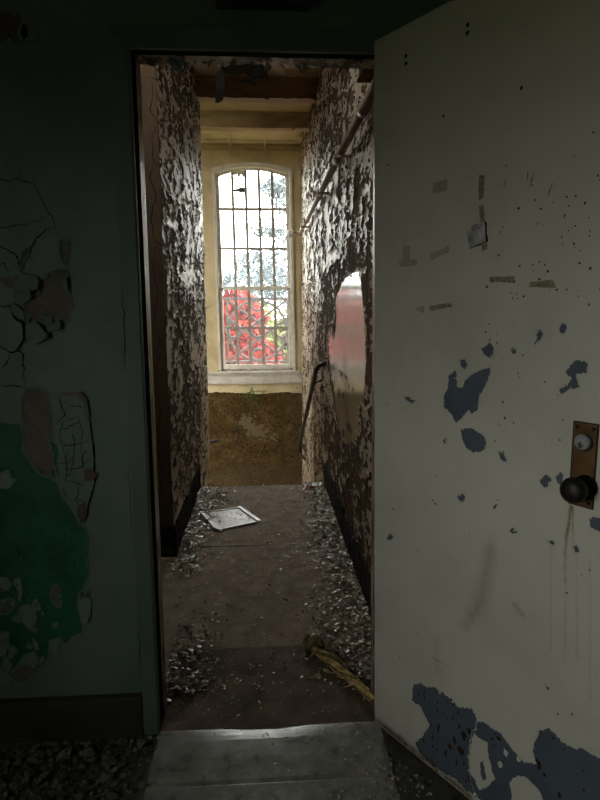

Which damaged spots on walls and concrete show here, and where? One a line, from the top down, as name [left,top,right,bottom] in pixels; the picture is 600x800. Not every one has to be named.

crack [0,168,60,389]
peeling [146,57,373,572]
peeling [0,421,92,685]